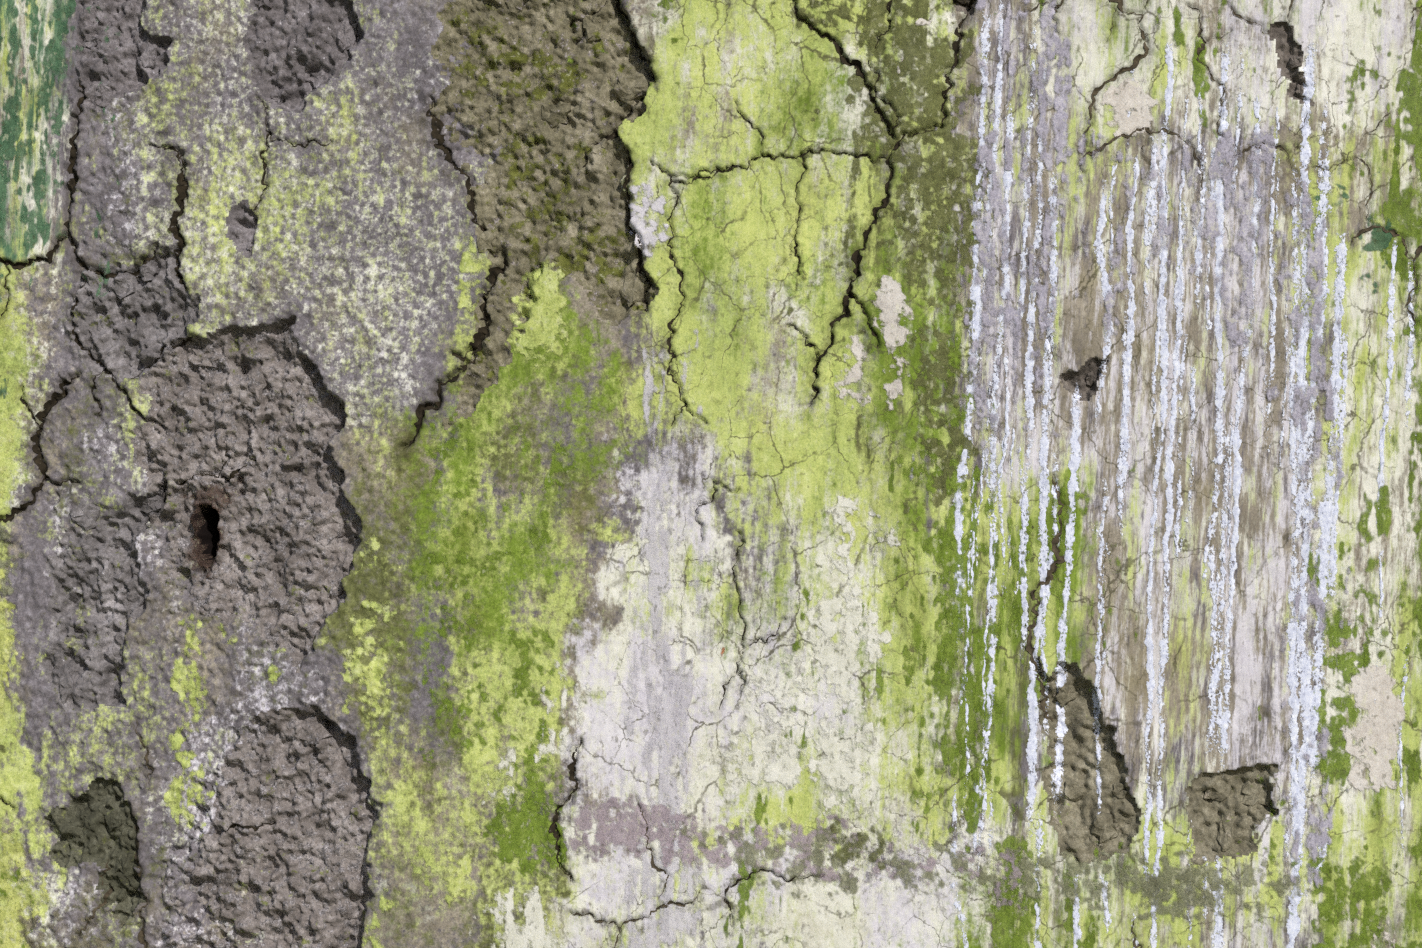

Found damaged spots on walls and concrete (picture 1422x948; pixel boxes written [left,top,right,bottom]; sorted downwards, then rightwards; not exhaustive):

crack [0,83,193,522]
spalling [39,233,362,711]
spalling [243,0,365,113]
crack [405,100,507,448]
spalling [429,0,669,430]
crack [570,0,974,426]
water stain [569,0,1422,948]
crack [1079,0,1422,336]
spalling [44,705,377,948]
crack [548,740,824,948]
spalling [1033,656,1141,864]
spalling [1185,763,1279,865]